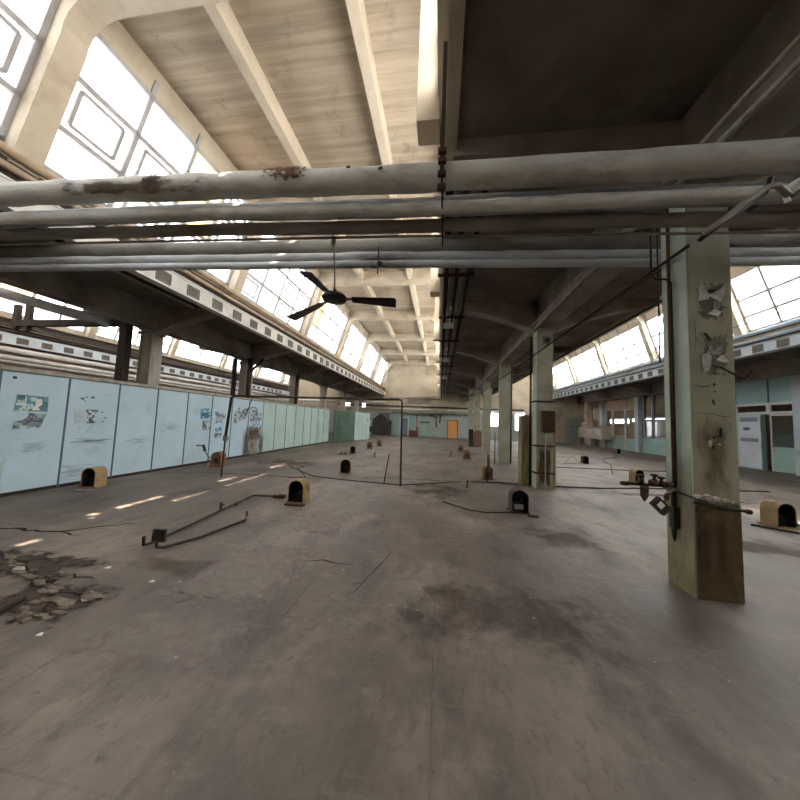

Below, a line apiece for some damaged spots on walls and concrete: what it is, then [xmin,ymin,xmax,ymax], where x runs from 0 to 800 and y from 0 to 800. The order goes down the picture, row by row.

corrosion [63,180,199,195]
corrosion [262,166,306,181]
peeling [697,283,727,320]
peeling [700,333,729,405]
corrosion [243,426,263,456]
crack [0,522,143,535]
spalling [0,549,115,624]
crack [310,553,390,594]